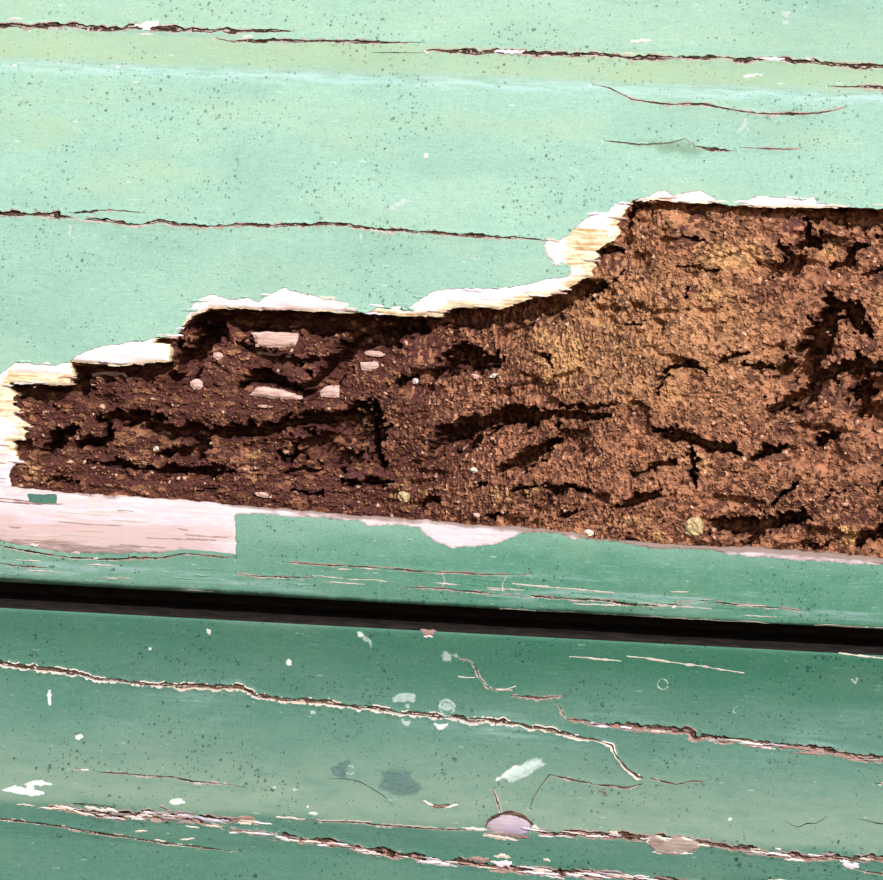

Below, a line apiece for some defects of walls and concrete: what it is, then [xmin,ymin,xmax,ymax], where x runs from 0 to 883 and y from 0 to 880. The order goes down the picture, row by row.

crack [0,17,883,120]
crack [604,134,800,156]
crack [0,205,546,245]
peeling [0,190,883,565]
crack [0,541,807,618]
crack [0,655,883,880]
peeling [462,810,539,841]
peeling [646,835,700,856]